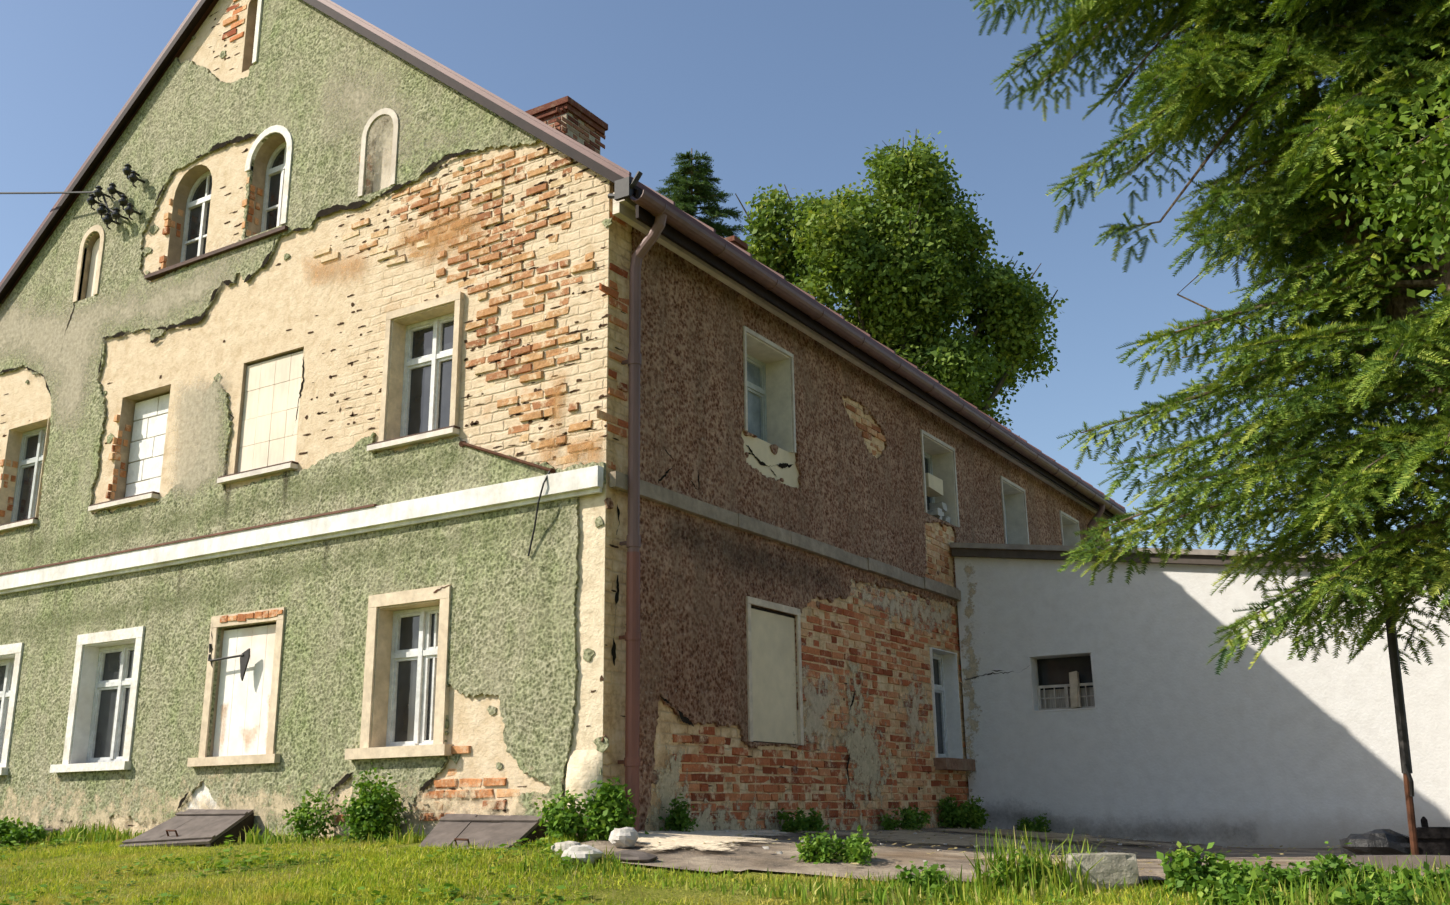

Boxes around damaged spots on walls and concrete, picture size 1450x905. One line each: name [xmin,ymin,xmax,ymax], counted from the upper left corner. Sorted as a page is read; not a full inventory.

flaking render [178,0,251,83]
peeling [0,366,52,535]
flaking render [93,135,632,791]
peeling [741,432,799,489]
flaking render [645,522,970,832]
flaking render [296,776,353,838]
flaking render [401,684,567,838]